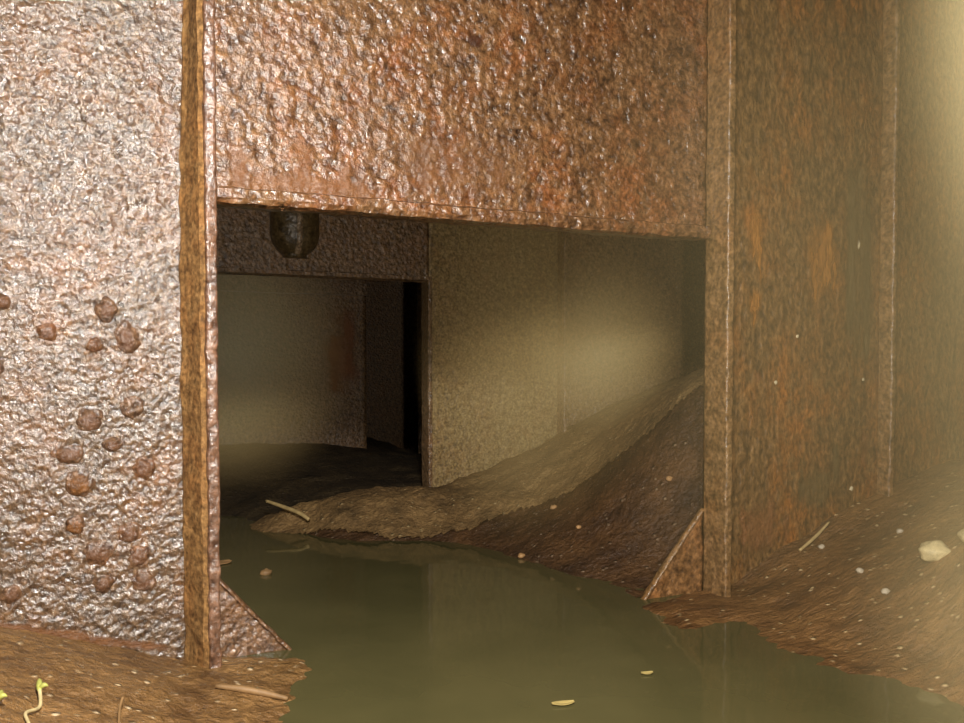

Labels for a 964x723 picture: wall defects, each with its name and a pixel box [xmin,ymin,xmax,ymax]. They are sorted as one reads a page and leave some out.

corrosion [468,35,481,47]
corrosion [0,293,11,311]
corrosion [37,322,57,341]
corrosion [94,296,141,354]
corrosion [86,337,104,352]
corrosion [119,396,144,419]
corrosion [76,408,103,431]
corrosion [101,437,124,452]
corrosion [49,445,97,497]
corrosion [132,456,156,480]
corrosion [65,514,157,593]
corrosion [0,584,22,604]